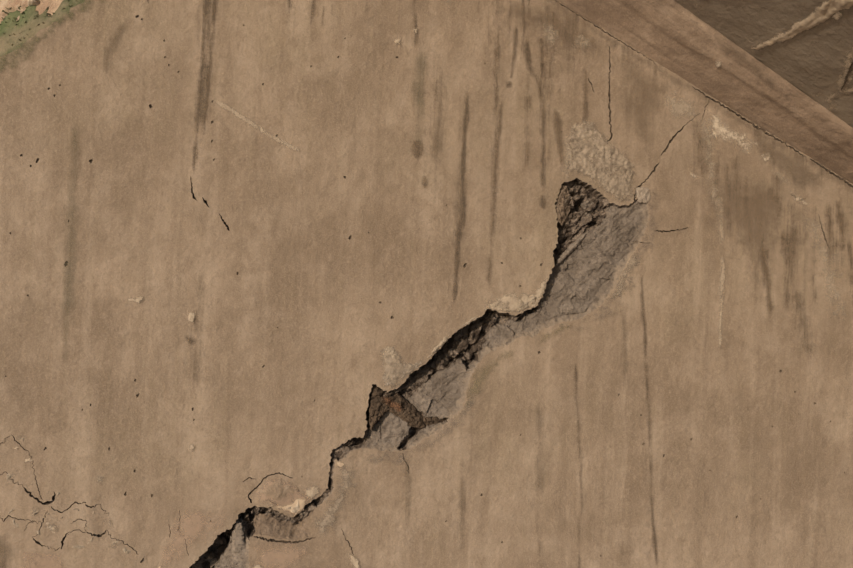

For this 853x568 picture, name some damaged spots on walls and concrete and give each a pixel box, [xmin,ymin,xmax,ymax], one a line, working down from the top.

water stain [197,45,211,126]
water stain [512,0,531,70]
crack [556,1,655,142]
peeling [750,0,853,50]
water stain [453,105,468,300]
water stain [700,116,754,241]
spalling [380,335,449,387]
spalling [462,279,548,326]
crack [189,87,853,568]
crack [0,435,139,555]
flaking render [243,472,319,515]